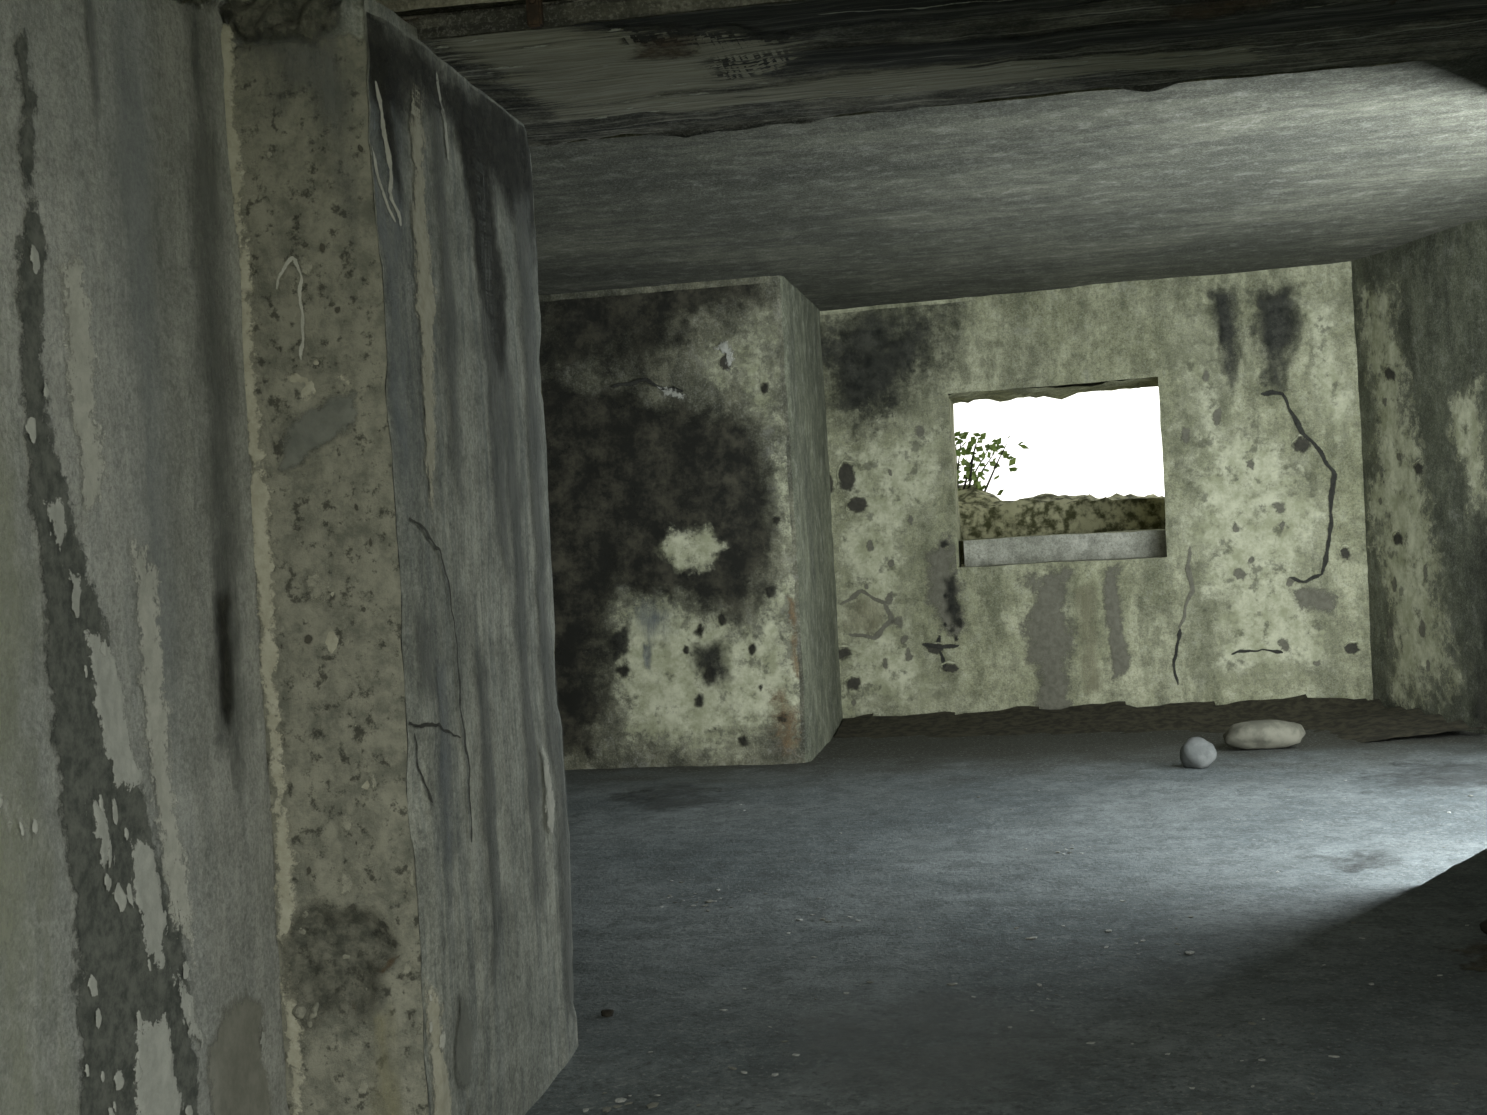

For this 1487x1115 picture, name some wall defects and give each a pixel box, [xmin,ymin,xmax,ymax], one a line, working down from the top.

spalling [14,0,452,1115]
crack [1261,390,1338,613]